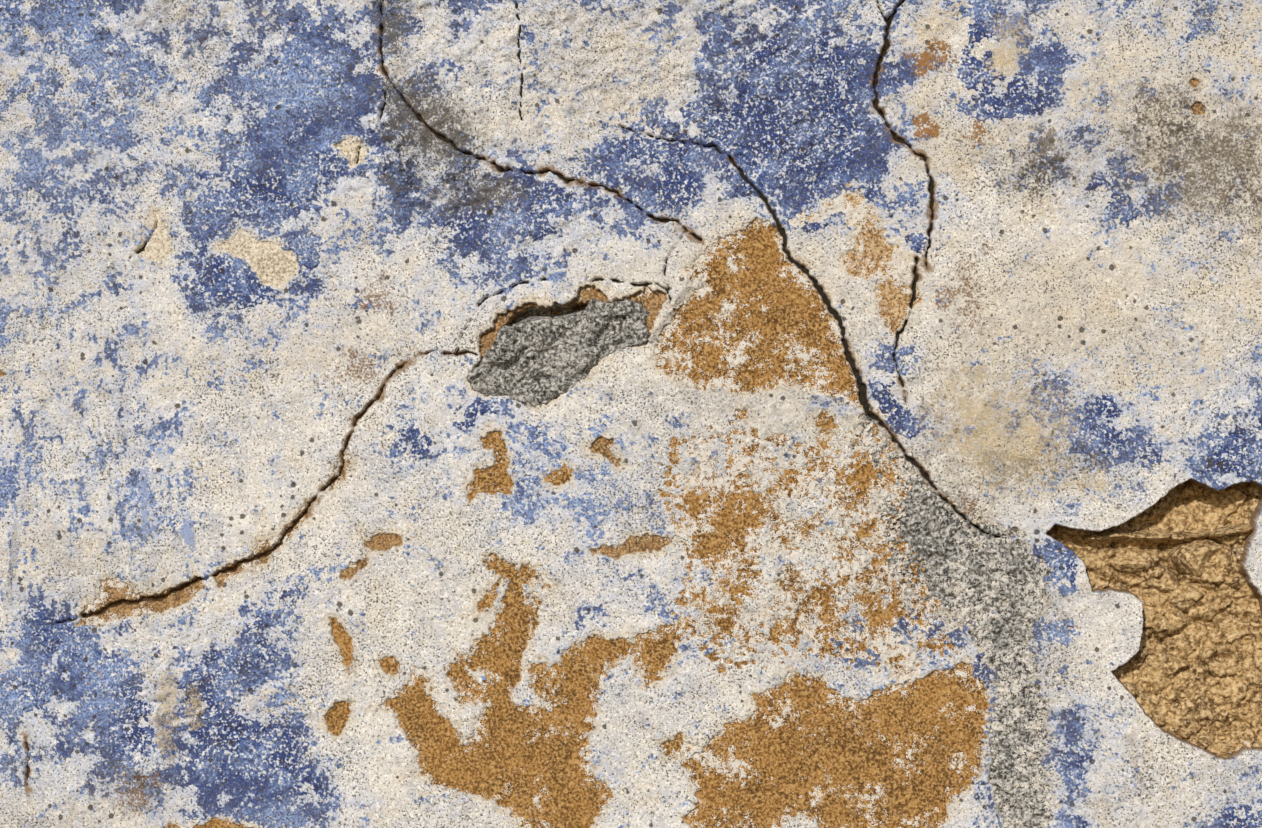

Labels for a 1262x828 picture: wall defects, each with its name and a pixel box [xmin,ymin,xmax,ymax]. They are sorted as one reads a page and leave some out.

peeling [186,227,330,310]
peeling [180,138,367,226]
crack [58,278,547,623]
crack [356,0,702,303]
crack [621,0,1001,537]
flaking render [380,0,1262,828]
flaking render [166,818,253,828]